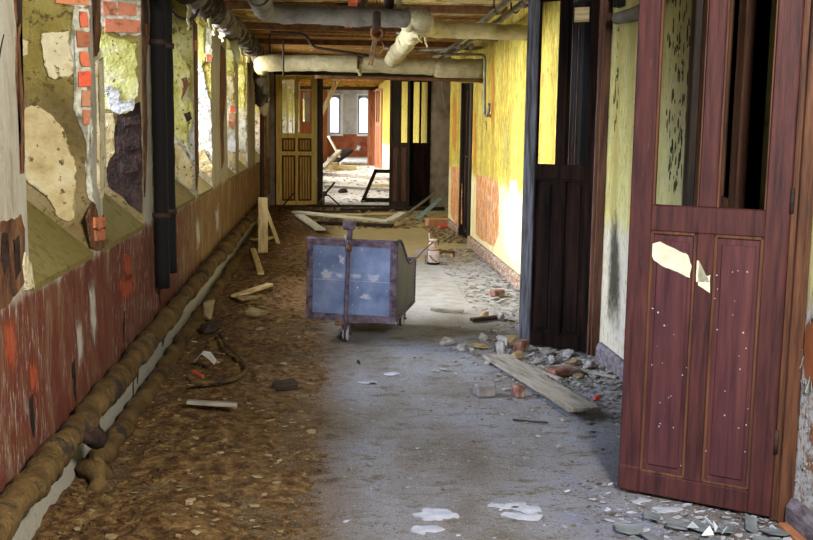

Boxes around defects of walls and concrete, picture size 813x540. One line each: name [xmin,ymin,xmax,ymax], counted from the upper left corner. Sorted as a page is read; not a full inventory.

flaking render [13,0,149,251]
peeling [567,480,792,540]
peeling [795,309,813,511]